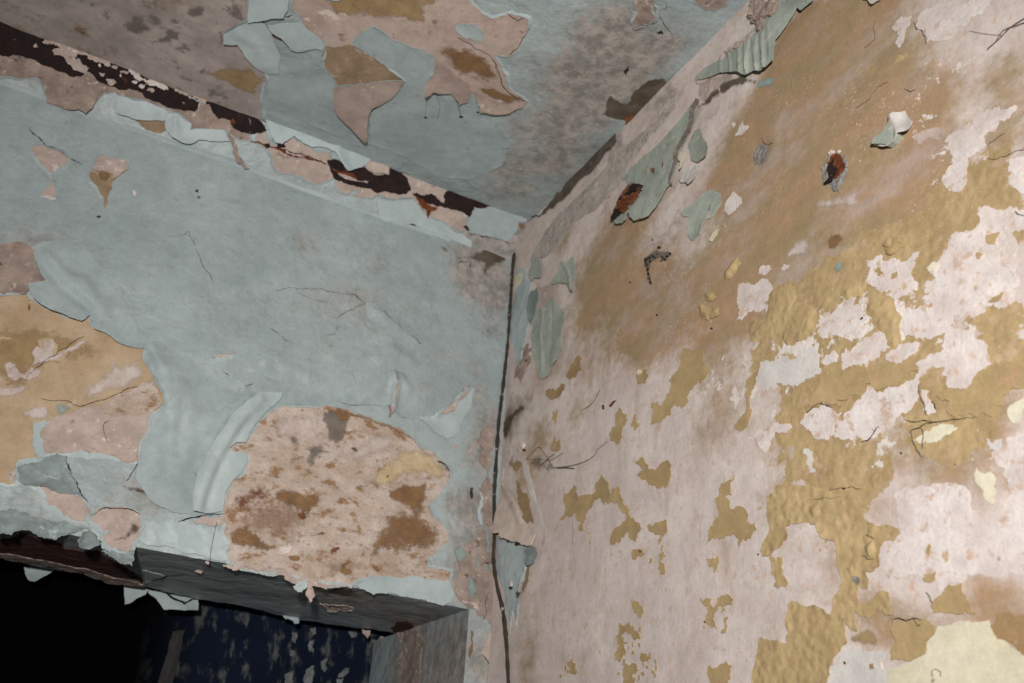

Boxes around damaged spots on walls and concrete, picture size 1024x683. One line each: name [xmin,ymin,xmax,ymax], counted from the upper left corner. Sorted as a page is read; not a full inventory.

flaking render [0,241,166,553]
flaking render [0,0,533,233]
flaking render [220,404,495,664]
flaking render [513,88,678,379]
rust [613,183,641,213]
flaking render [737,240,808,320]
flaking render [748,205,1024,473]
crack [905,384,975,456]
flaking render [879,398,1024,602]
flaking render [827,647,888,683]